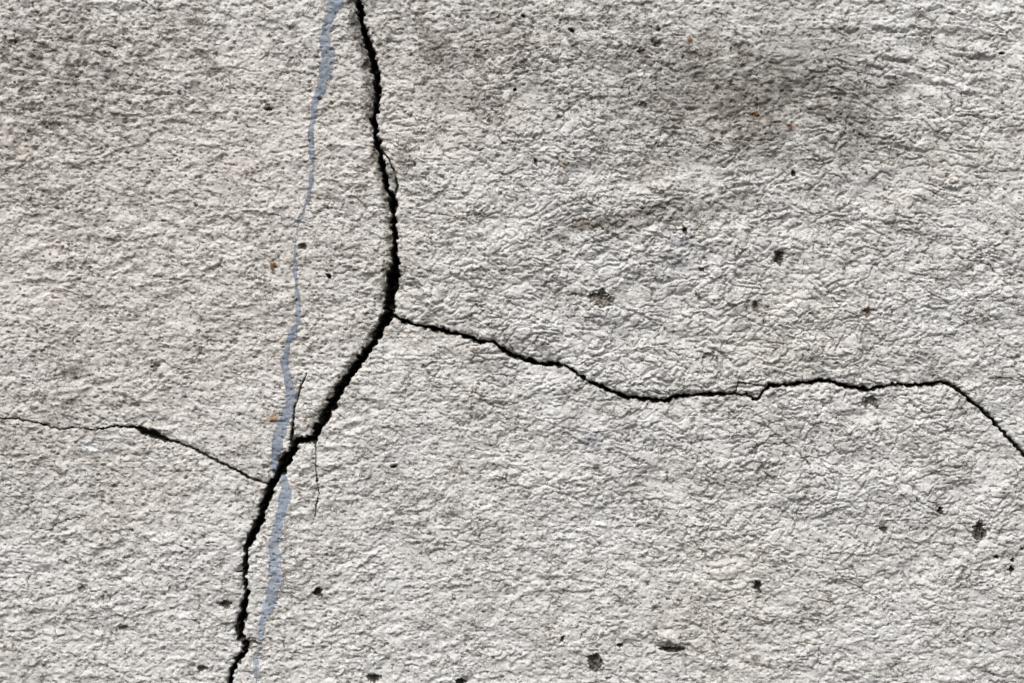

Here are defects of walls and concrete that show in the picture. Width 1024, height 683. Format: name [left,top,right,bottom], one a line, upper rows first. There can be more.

crack [953,253,994,273]
crack [0,0,401,683]
crack [393,313,1024,457]
crack [744,442,811,469]